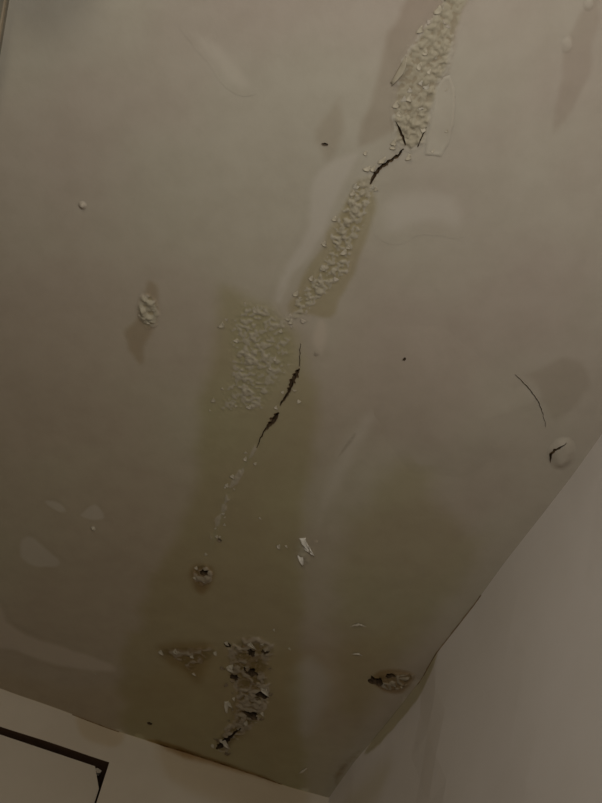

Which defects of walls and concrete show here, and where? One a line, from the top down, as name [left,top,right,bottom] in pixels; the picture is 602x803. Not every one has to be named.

peeling [389,0,472,160]
crack [370,121,427,185]
peeling [285,165,381,329]
crack [256,346,301,448]
flaking render [209,629,291,756]
flaking render [368,671,417,692]